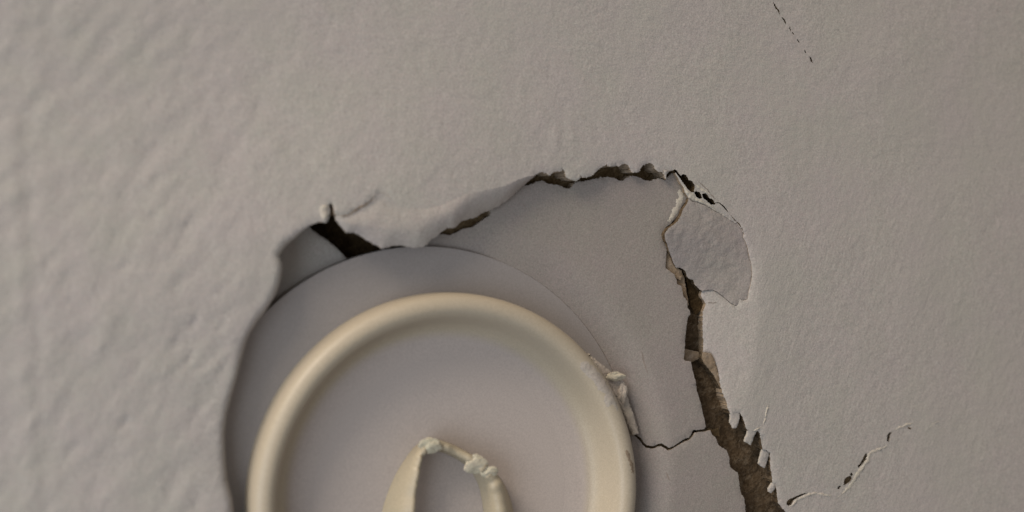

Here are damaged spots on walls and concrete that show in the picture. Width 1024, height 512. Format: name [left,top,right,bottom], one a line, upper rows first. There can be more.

peeling [661,198,752,306]
crack [634,252,939,512]